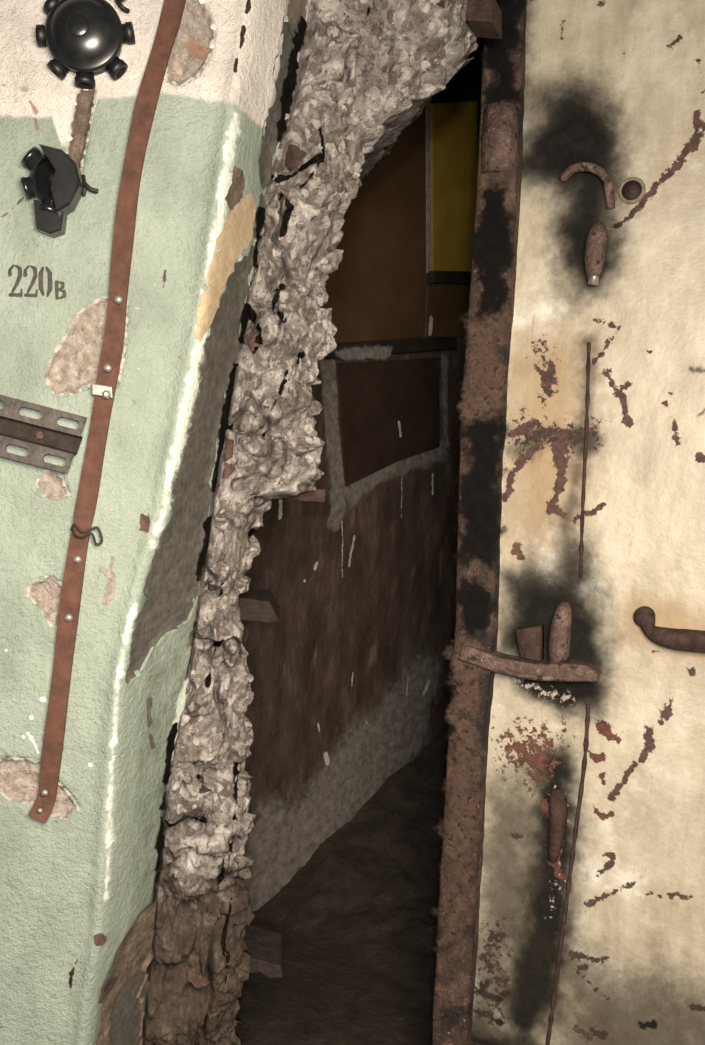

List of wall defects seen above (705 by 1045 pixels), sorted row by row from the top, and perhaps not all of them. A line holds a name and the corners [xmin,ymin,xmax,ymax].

crack [21,87,39,130]
spalling [66,87,98,172]
spalling [44,297,108,397]
rust [458,309,606,524]
rust [592,318,634,428]
spalling [90,0,478,1045]
spalling [27,574,62,627]
spalling [0,715,41,804]
rust [587,699,673,821]
rust [438,639,575,1035]
rust [596,852,616,877]
rust [584,882,636,908]